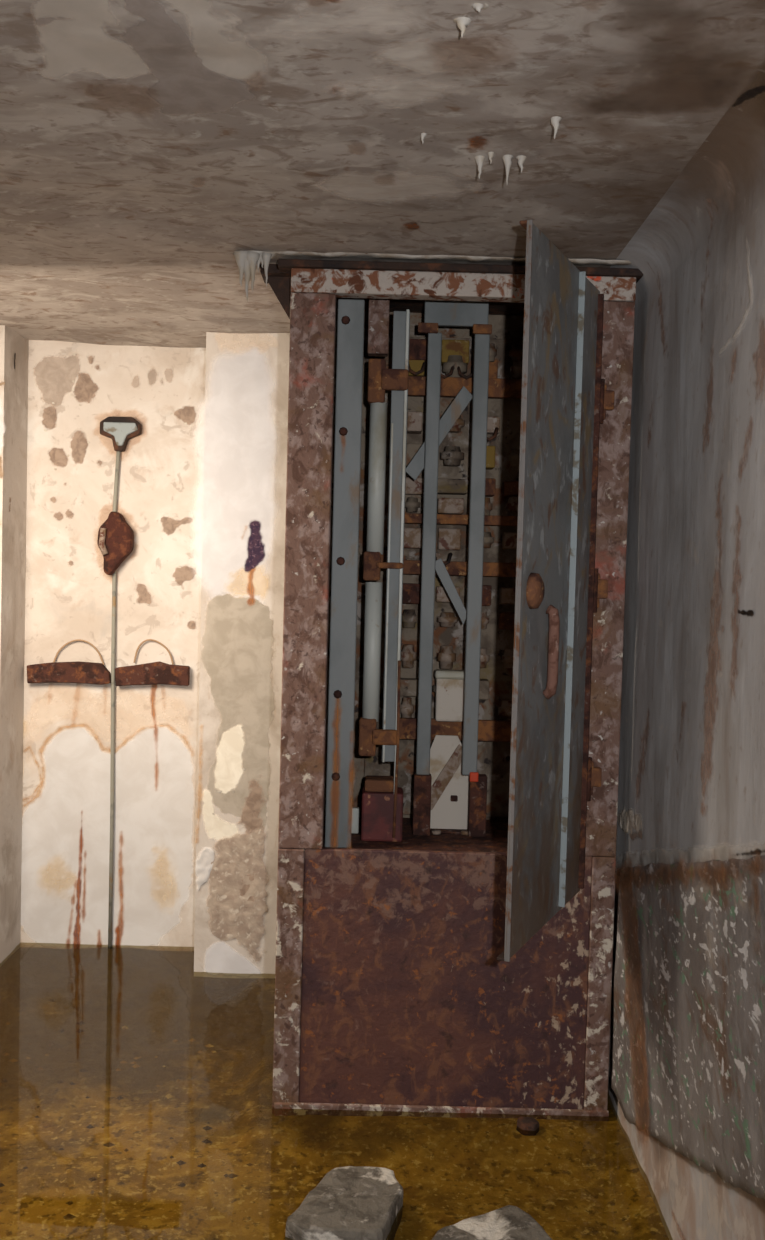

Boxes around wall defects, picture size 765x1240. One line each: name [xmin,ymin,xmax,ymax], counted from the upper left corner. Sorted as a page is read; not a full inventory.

damp [233,250,526,302]
corrosion [67,828,85,949]
damp [21,725,202,951]
spalling [188,594,275,976]
corrosion [621,857,649,1143]